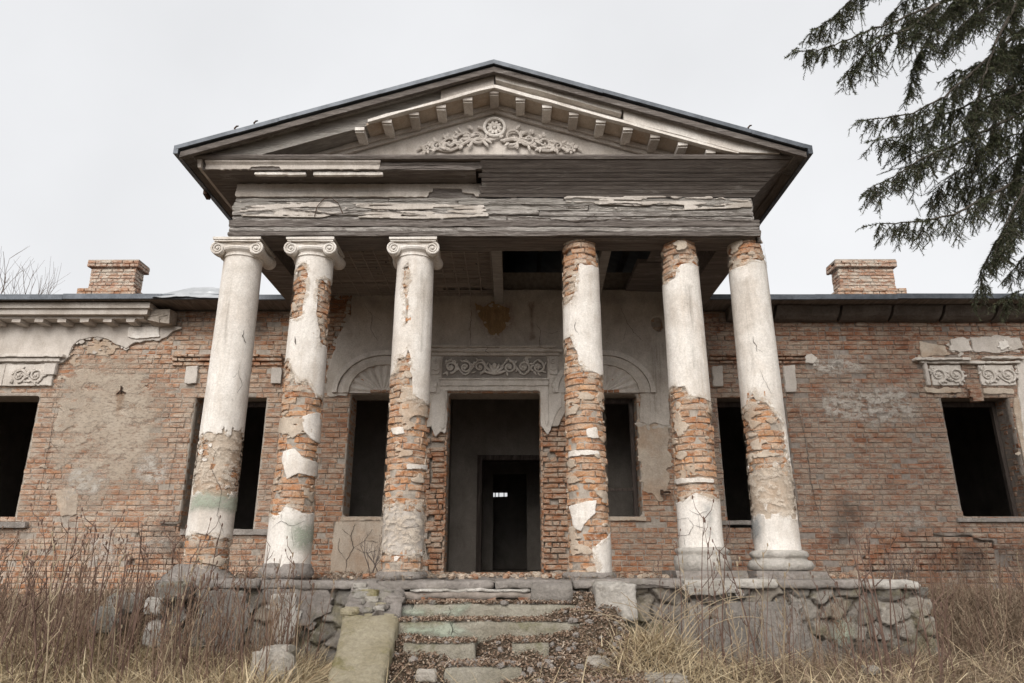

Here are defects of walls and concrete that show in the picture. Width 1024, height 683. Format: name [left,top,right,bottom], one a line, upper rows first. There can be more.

peeling [240,201,488,220]
peeling [564,196,752,211]
peeling [43,484,78,517]
peeling [53,327,160,437]
spalling [126,521,233,572]
peeling [192,428,244,499]
spalling [268,263,351,519]
spalling [379,353,449,573]
spalling [539,335,619,573]
spalling [634,386,721,504]
spalling [742,390,798,521]
peeling [917,335,1024,461]